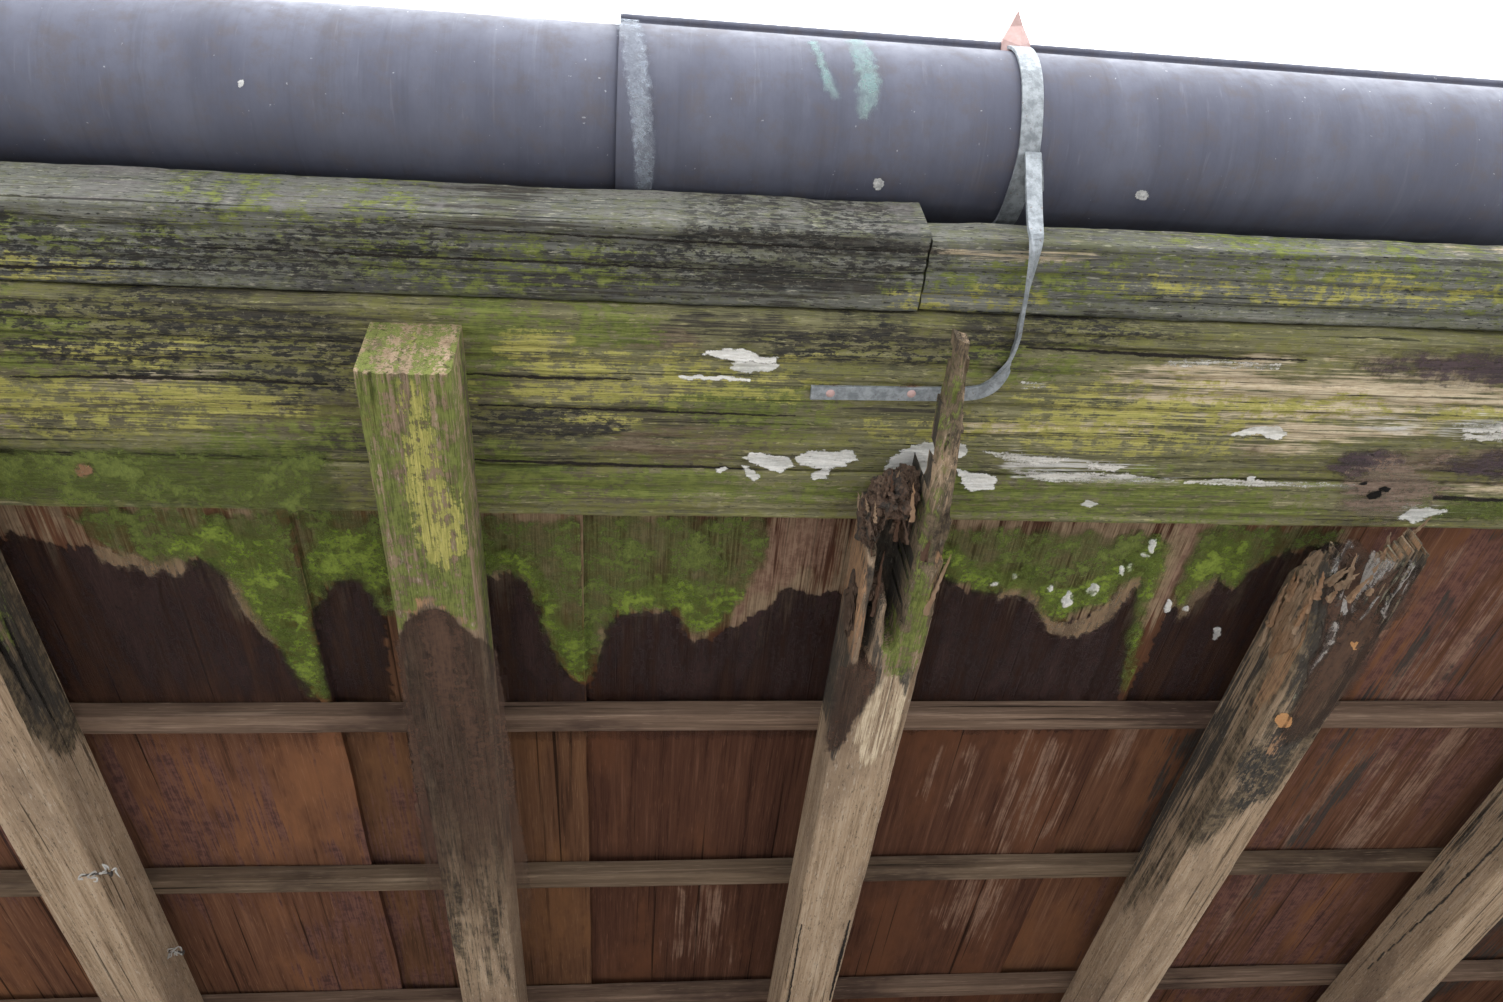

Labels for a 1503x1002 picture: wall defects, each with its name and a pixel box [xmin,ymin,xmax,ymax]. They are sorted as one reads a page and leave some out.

peeling [678,348,779,382]
damp [1355,349,1503,388]
peeling [1231,425,1287,440]
peeling [1461,423,1503,442]
peeling [716,449,858,481]
peeling [884,442,934,474]
peeling [957,444,997,492]
peeling [985,451,1300,487]
damp [1326,448,1406,480]
damp [911,539,1423,742]
damp [0,530,877,879]
crack [1367,838,1503,969]